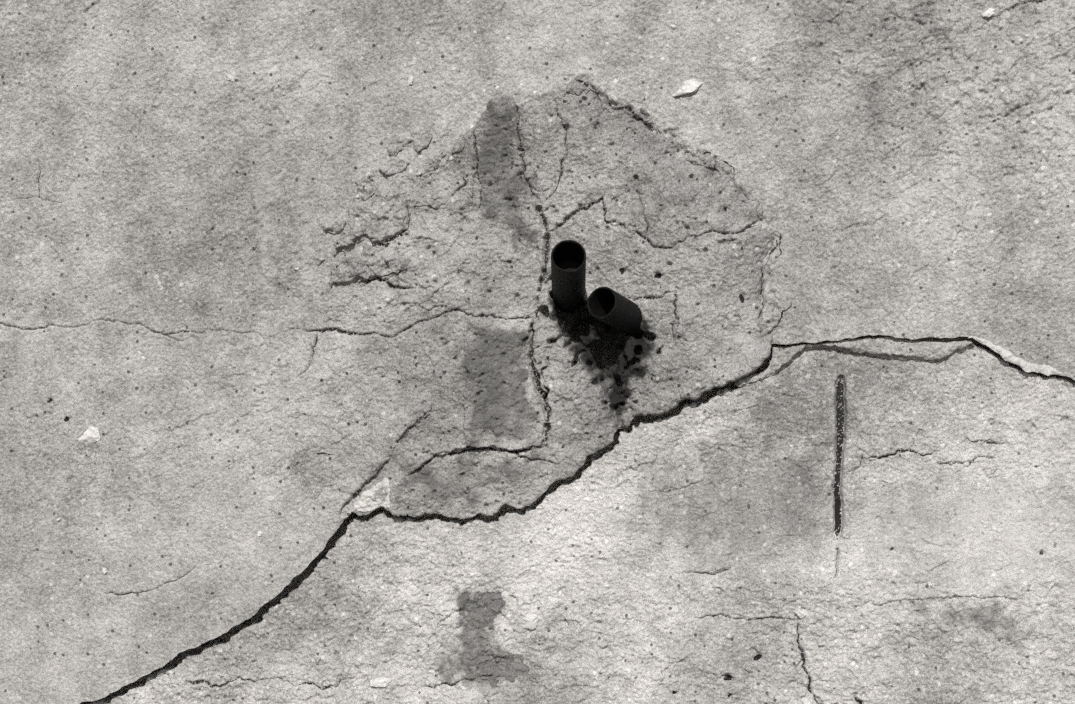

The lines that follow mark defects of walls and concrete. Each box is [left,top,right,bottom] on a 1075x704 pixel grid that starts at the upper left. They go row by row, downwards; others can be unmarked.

crack [576,80,663,133]
crack [0,102,793,511]
crack [854,438,1004,470]
crack [110,570,192,596]
crack [187,673,358,690]
crack [700,614,819,704]